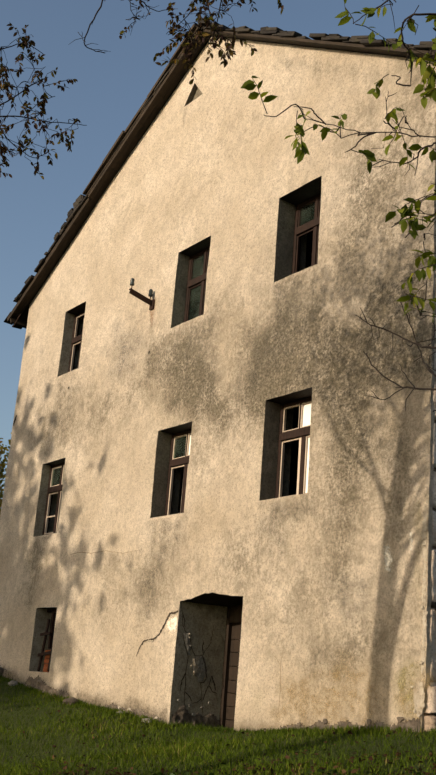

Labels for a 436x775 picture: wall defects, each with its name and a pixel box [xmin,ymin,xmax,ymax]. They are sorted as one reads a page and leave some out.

crack [136,605,217,712]